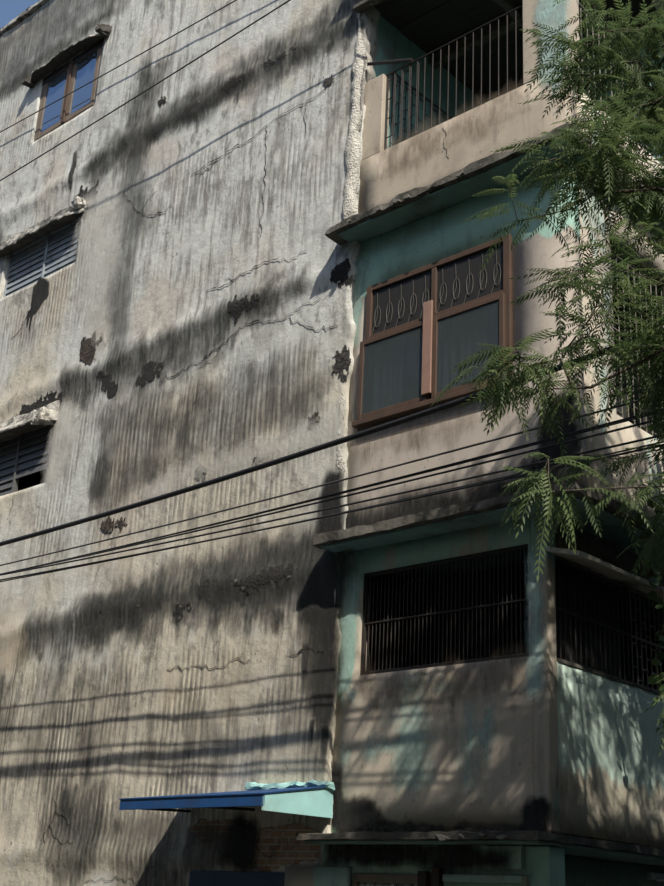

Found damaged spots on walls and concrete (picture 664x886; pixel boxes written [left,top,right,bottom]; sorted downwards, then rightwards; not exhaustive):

crack [190,67,346,237]
damp [60,0,366,507]
flaking render [227,293,260,325]
crack [206,251,303,292]
flaking render [330,258,366,333]
flaking render [79,331,118,398]
flaking render [332,344,351,382]
flaking render [15,390,74,483]
flaking render [100,516,127,533]
damp [20,392,583,833]
damp [41,786,258,886]
damp [325,844,508,872]